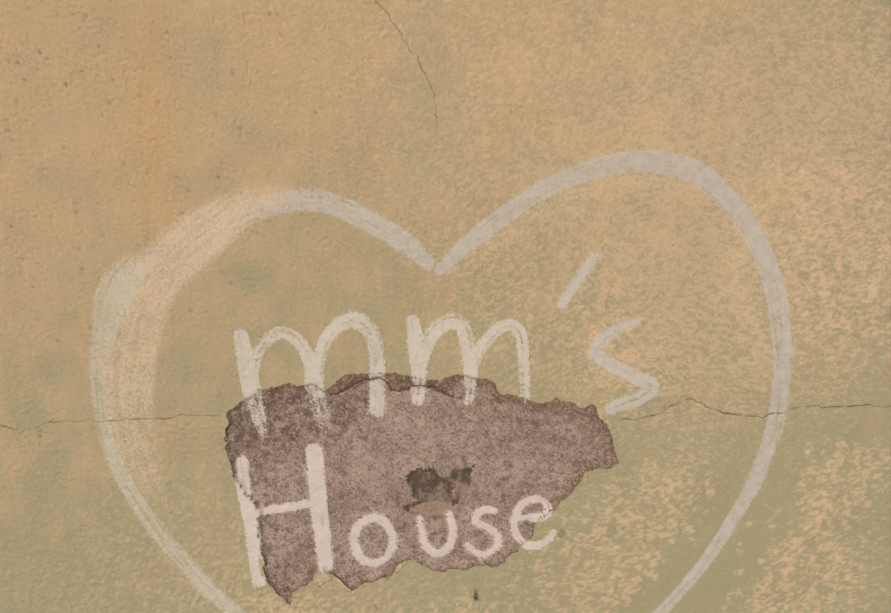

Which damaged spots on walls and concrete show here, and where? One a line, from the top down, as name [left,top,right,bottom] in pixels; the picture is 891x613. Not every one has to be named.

peeling [224,372,731,613]